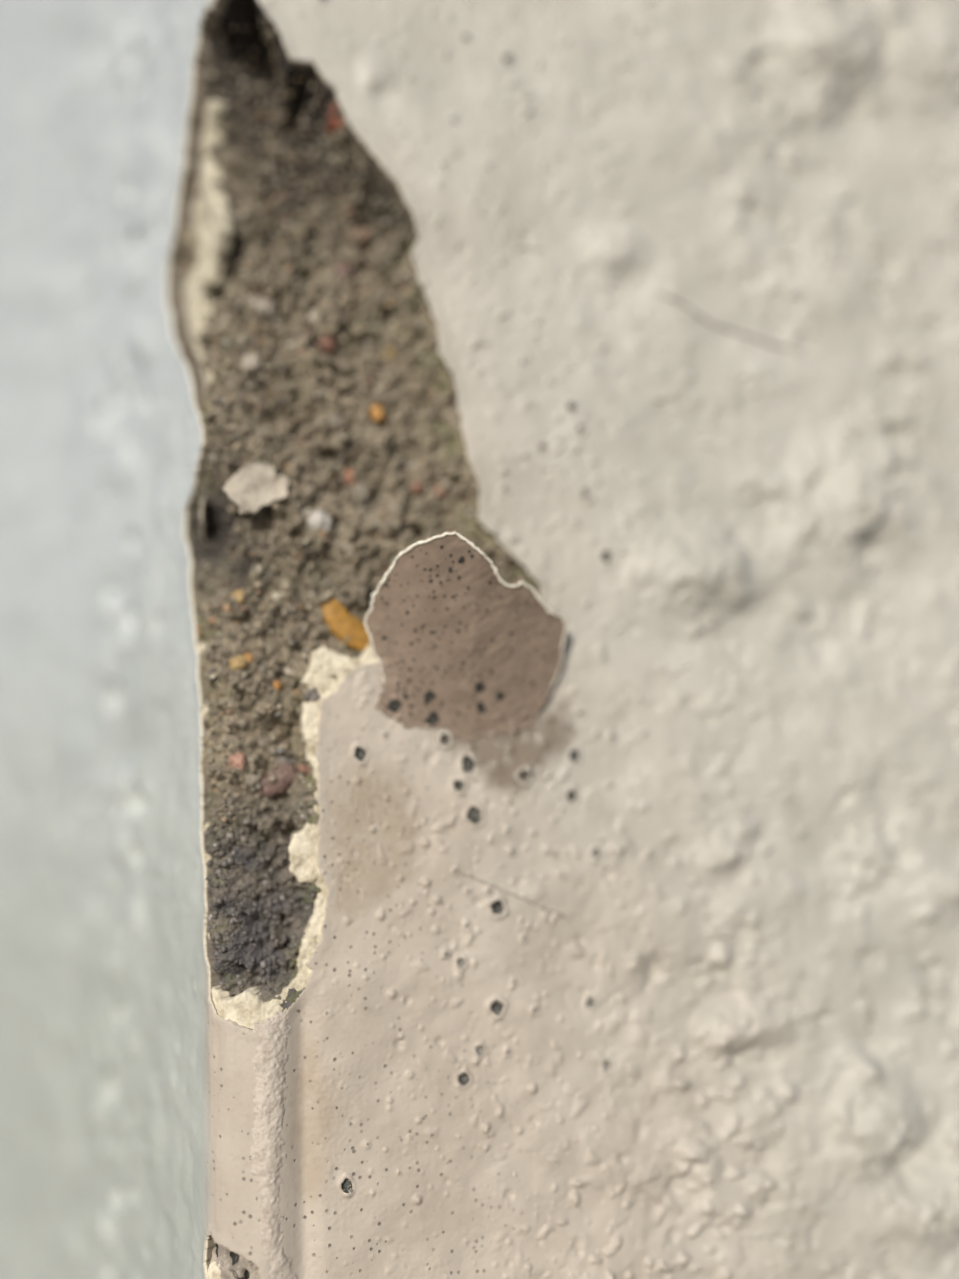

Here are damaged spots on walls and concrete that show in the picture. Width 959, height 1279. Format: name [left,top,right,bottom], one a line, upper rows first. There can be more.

spalling [180,0,568,1029]
spalling [208,1244,261,1279]